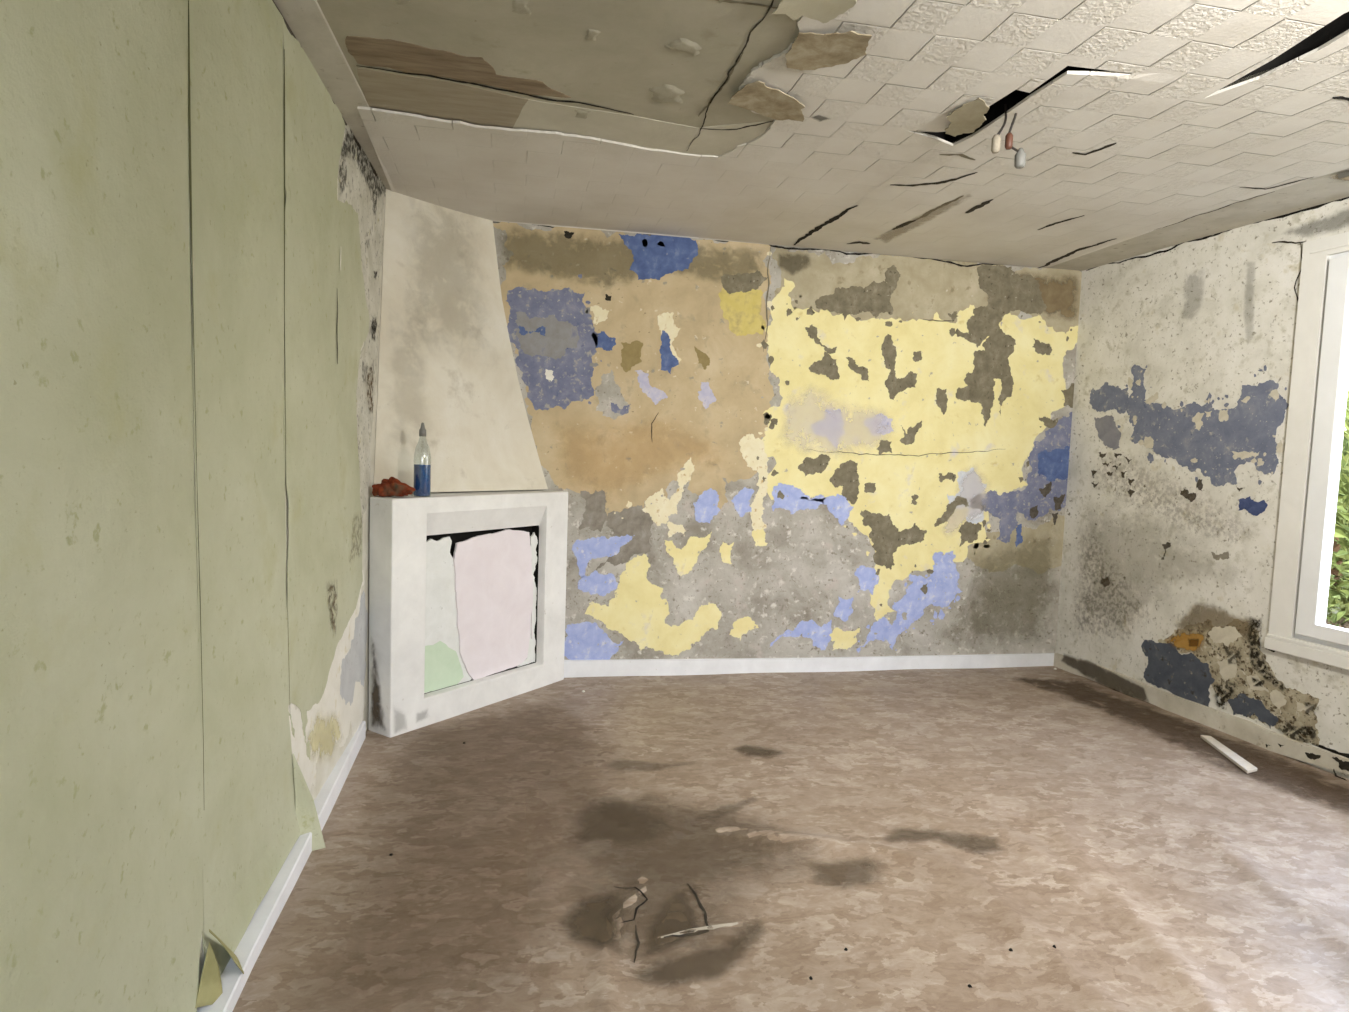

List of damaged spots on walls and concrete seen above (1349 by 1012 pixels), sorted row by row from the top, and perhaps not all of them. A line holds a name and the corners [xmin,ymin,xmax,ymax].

crack [356,65,634,115]
crack [688,0,778,149]
peeling [773,0,872,71]
water stain [340,132,386,213]
peeling [493,222,1082,656]
peeling [1091,452,1135,497]
peeling [1180,479,1203,502]
flaking render [288,570,365,791]
water stain [1180,605,1284,690]
water stain [1021,655,1349,808]
water stain [890,830,996,851]
water stain [568,806,770,982]